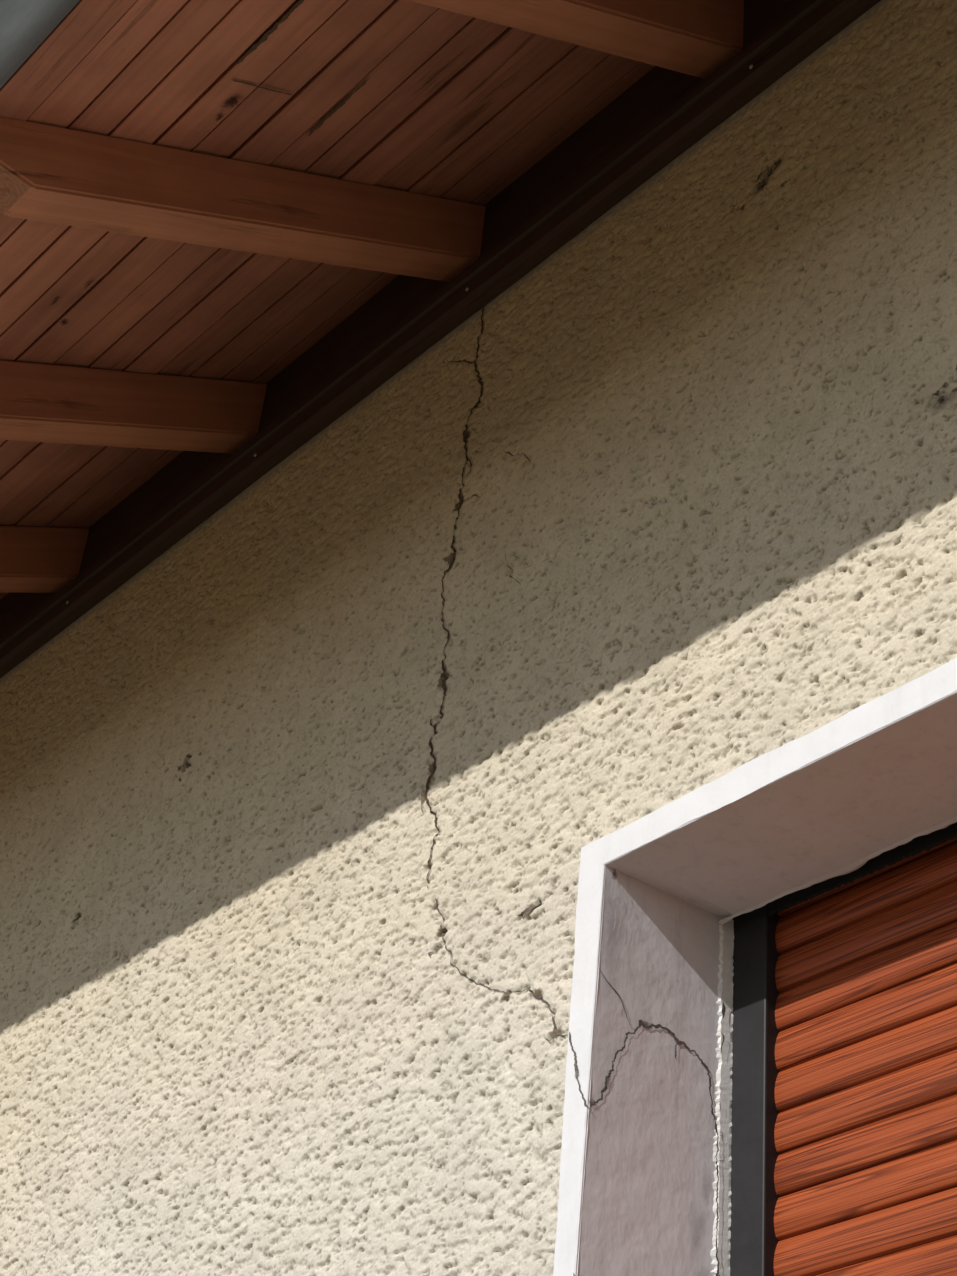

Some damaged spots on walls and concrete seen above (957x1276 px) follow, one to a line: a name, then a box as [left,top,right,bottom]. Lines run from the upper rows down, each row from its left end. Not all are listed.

crack [421,303,726,1276]